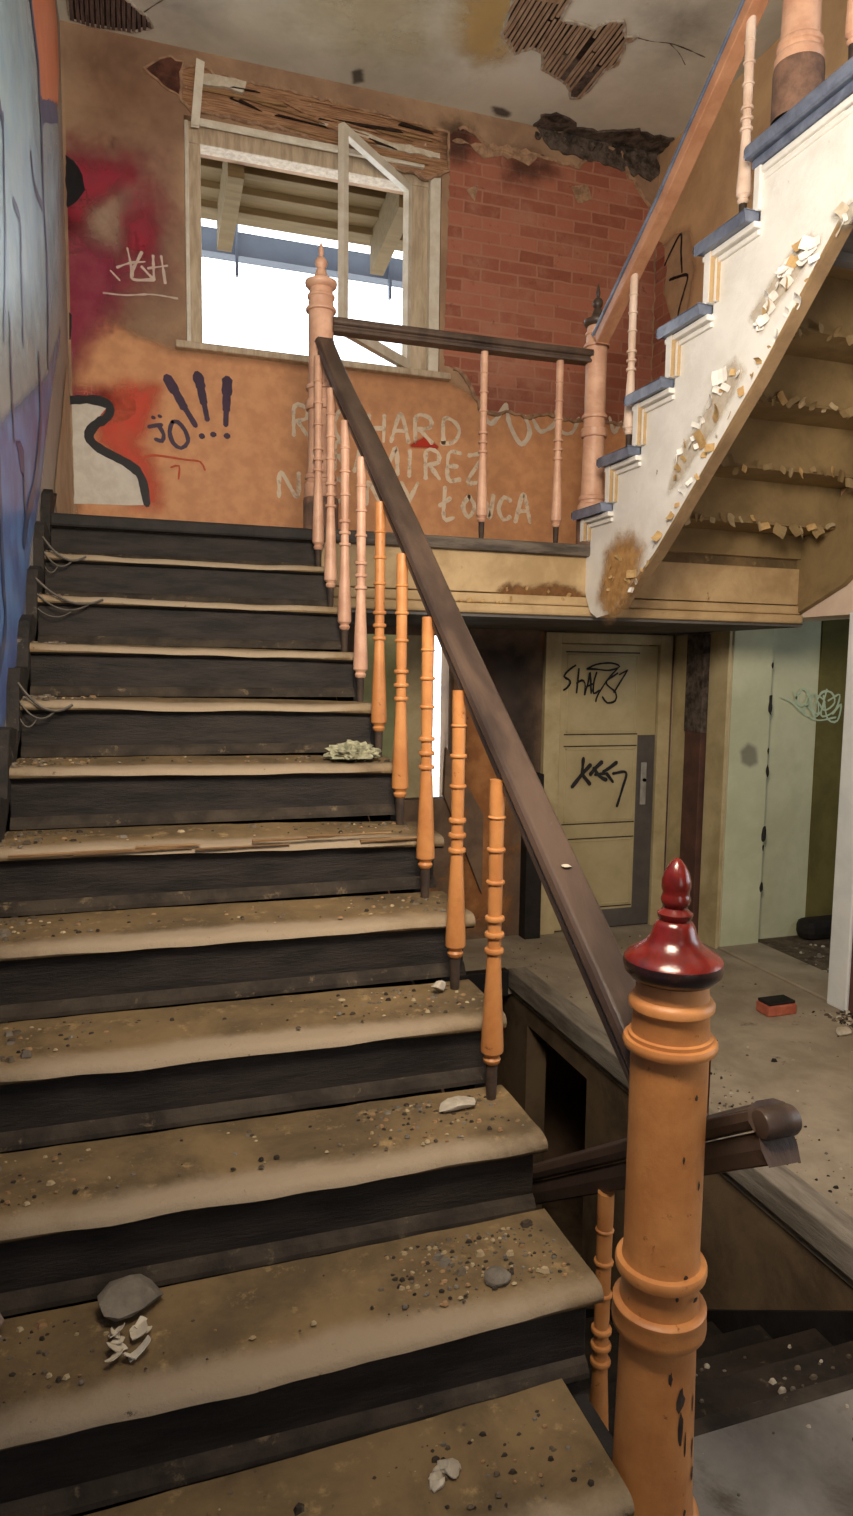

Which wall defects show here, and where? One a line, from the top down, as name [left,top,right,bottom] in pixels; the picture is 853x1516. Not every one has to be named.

spalling [66,0,155,34]
water stain [465,0,511,58]
spalling [142,55,184,97]
peeling [203,73,247,95]
flaking render [319,0,675,424]
peeling [498,201,853,616]